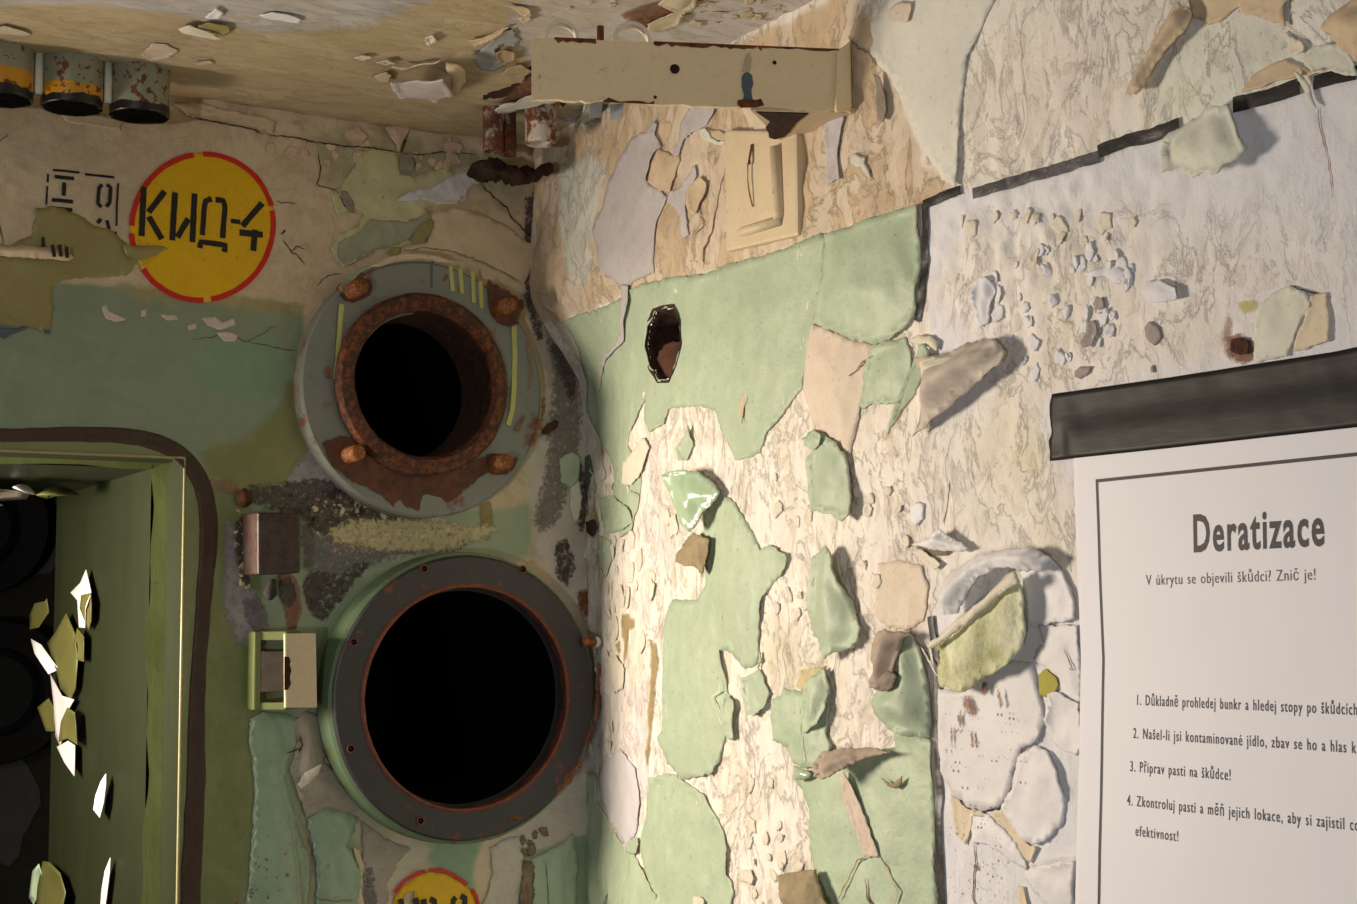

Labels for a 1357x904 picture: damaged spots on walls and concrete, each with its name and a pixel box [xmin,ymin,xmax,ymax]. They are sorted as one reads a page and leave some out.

peeling [259,12,301,24]
peeling [354,4,532,104]
peeling [1125,0,1357,94]
peeling [1160,104,1246,178]
peeling [0,206,169,339]
rust [340,272,372,303]
rust [486,279,525,326]
peeling [993,207,1178,379]
rust [514,341,559,446]
rust [324,436,517,511]
peeling [483,108,1081,904]
peeling [235,712,410,904]